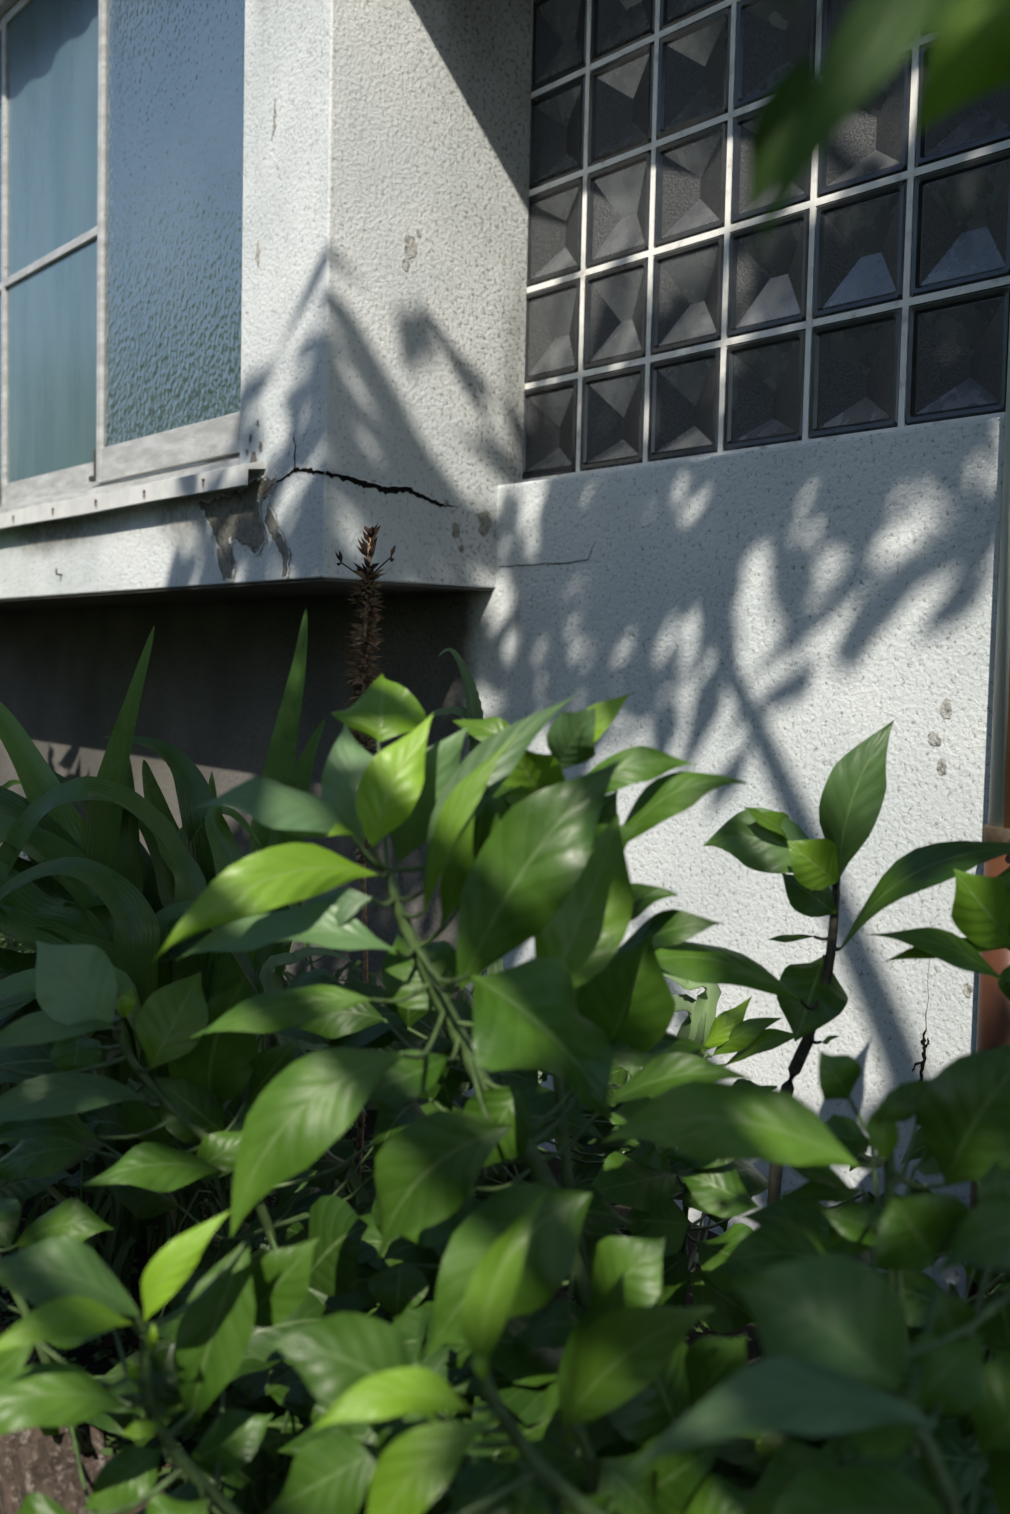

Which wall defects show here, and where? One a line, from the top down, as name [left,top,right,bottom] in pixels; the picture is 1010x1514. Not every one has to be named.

peeling [195,420,290,583]
crack [248,433,454,507]
crack [498,545,594,568]